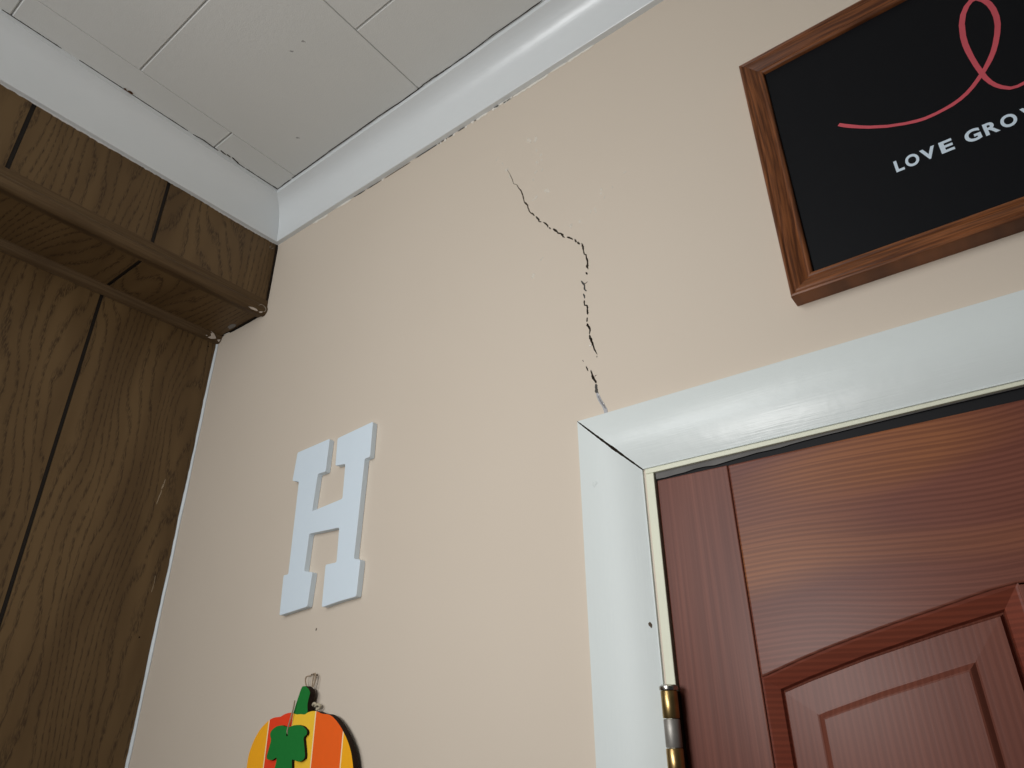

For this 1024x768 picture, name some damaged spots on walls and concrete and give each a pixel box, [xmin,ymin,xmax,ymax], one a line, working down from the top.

crack [508,171,643,470]